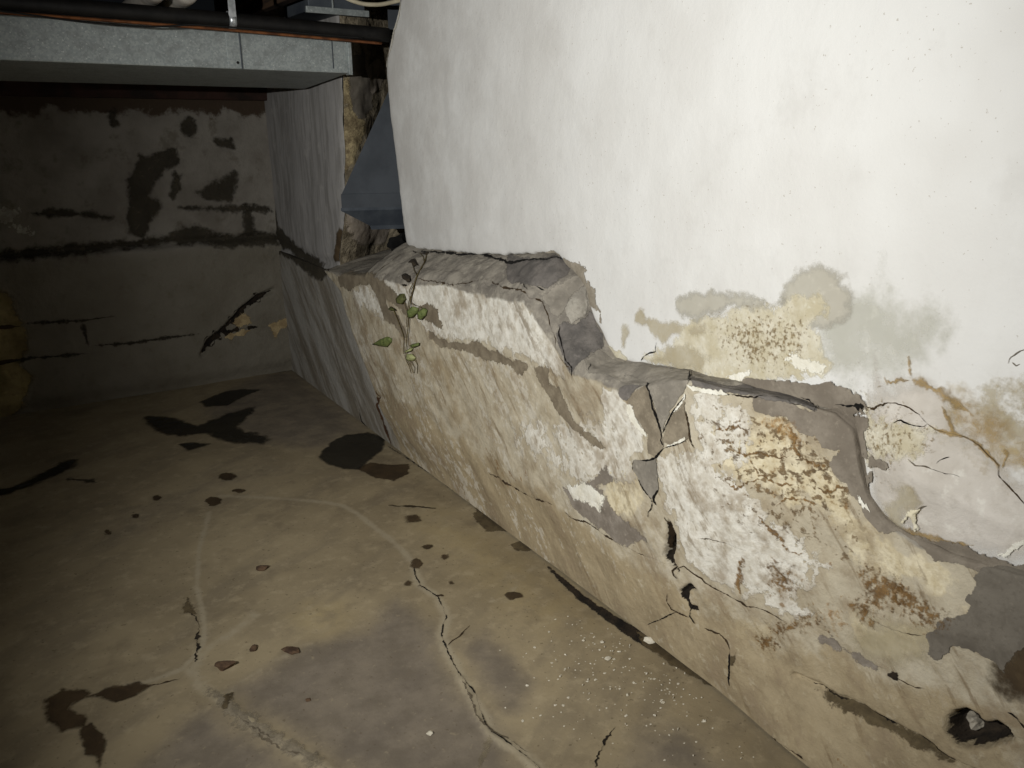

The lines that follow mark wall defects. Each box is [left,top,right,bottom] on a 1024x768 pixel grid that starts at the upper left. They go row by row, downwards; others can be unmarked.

water stain [0,148,343,281]
crack [10,290,287,363]
peeling [338,271,604,450]
spalling [506,250,728,498]
water stain [622,266,851,381]
water stain [319,433,409,481]
peeling [562,466,647,547]
crack [489,345,781,620]
crack [729,394,1024,504]
crack [547,566,735,687]
water stain [44,682,149,765]
spalling [947,708,1014,745]